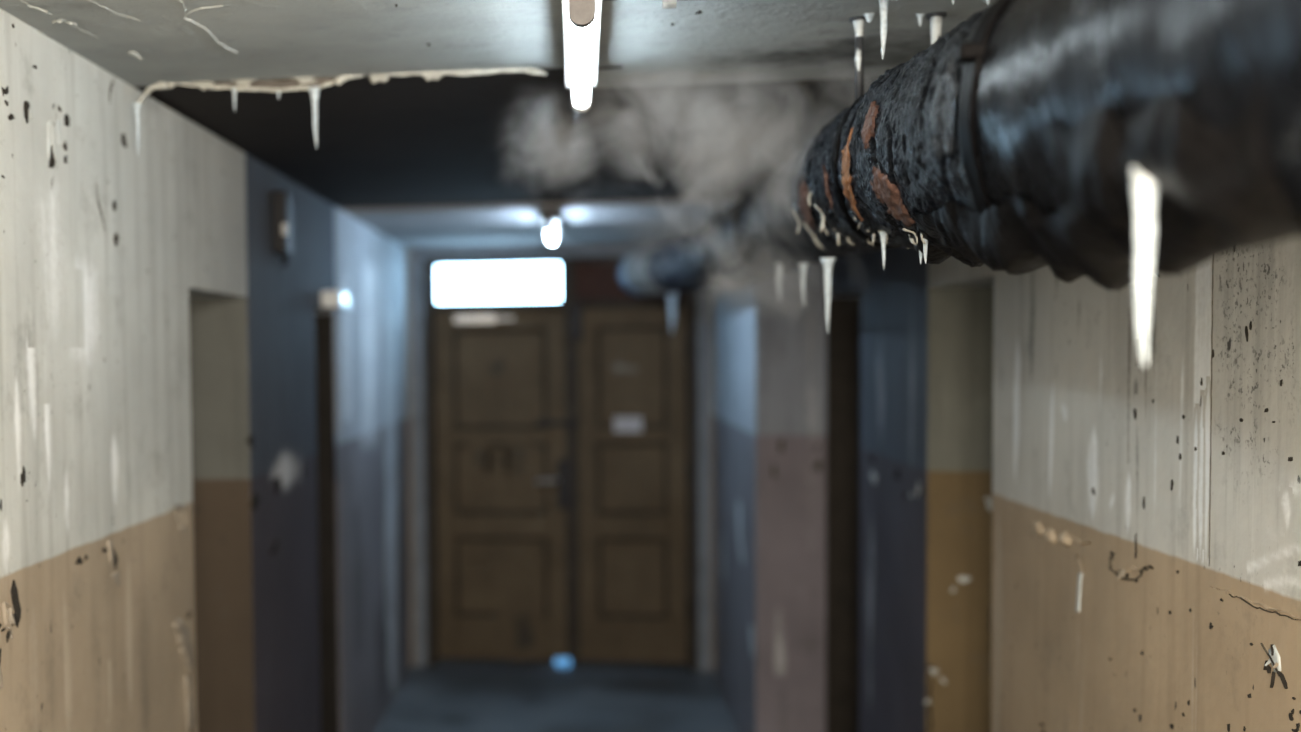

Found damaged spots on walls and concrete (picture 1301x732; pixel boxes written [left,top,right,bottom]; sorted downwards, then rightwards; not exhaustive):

crack [178,0,238,53]
peeling [1109,533,1153,582]
crack [1210,586,1301,620]
peeling [0,580,21,689]
flaking render [1250,643,1301,732]